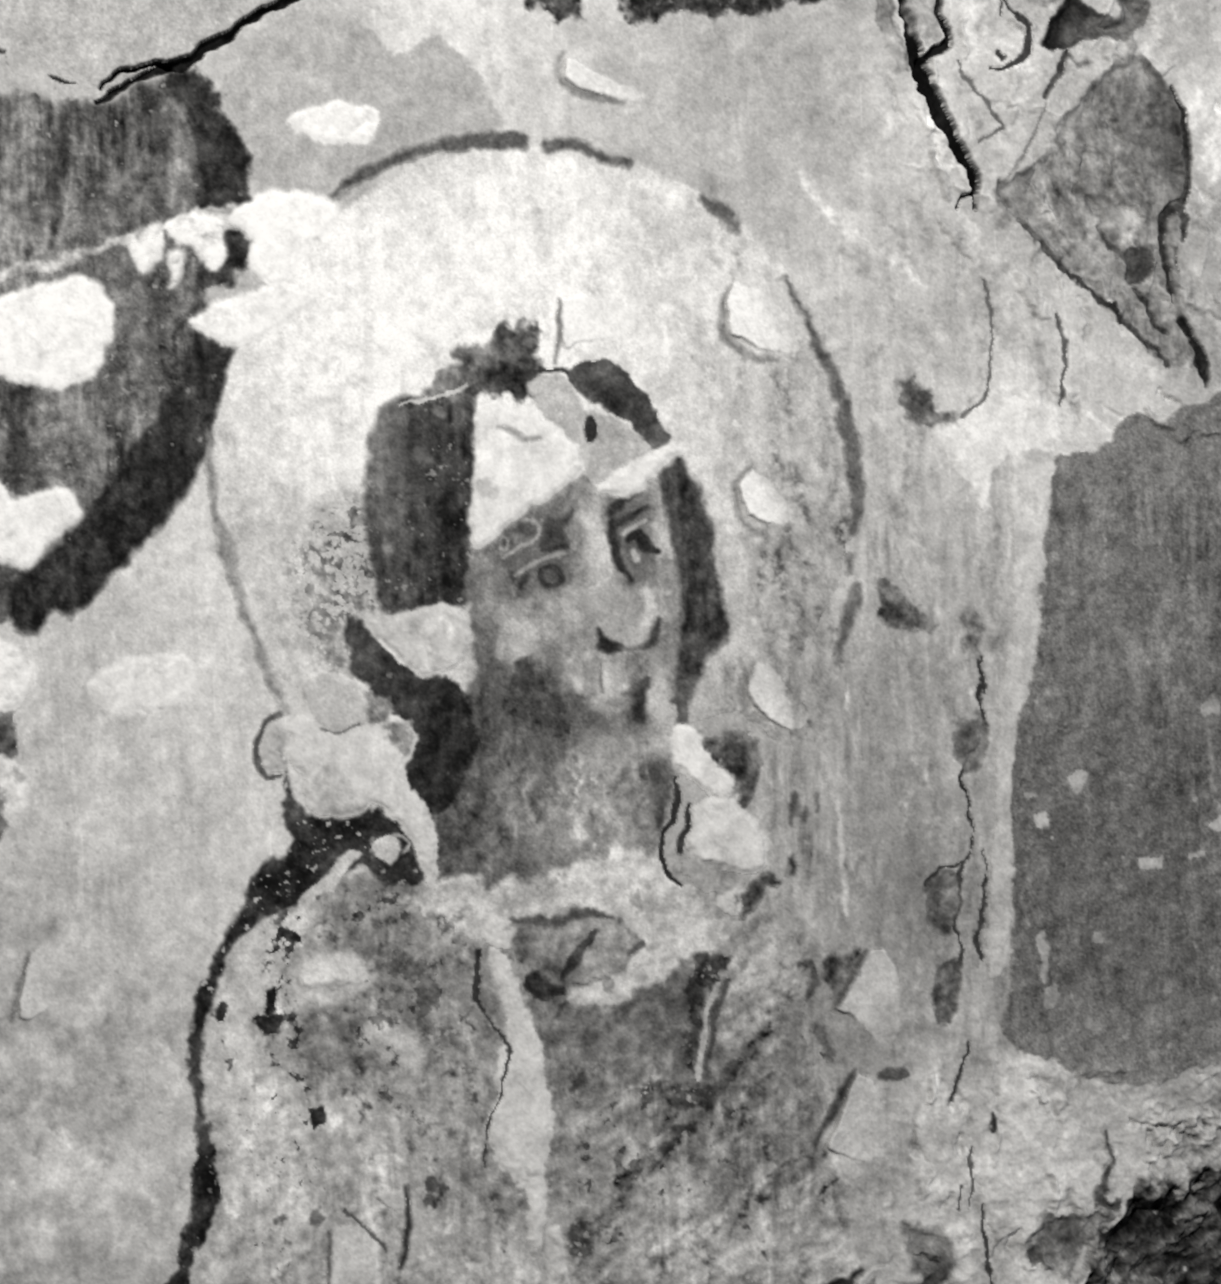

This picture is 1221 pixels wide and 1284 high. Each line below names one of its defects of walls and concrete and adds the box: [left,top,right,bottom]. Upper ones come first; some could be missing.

crack [48,0,300,104]
flaking render [286,100,381,146]
crack [898,0,1032,209]
flaking render [0,272,115,391]
crack [1055,313,1069,406]
flaking render [0,482,83,571]
crack [975,656,987,722]
flaking render [252,670,440,888]
flaking render [670,723,770,916]
crack [924,768,988,965]
crack [948,1041,970,1104]
spalling [1024,1096,1221,1284]